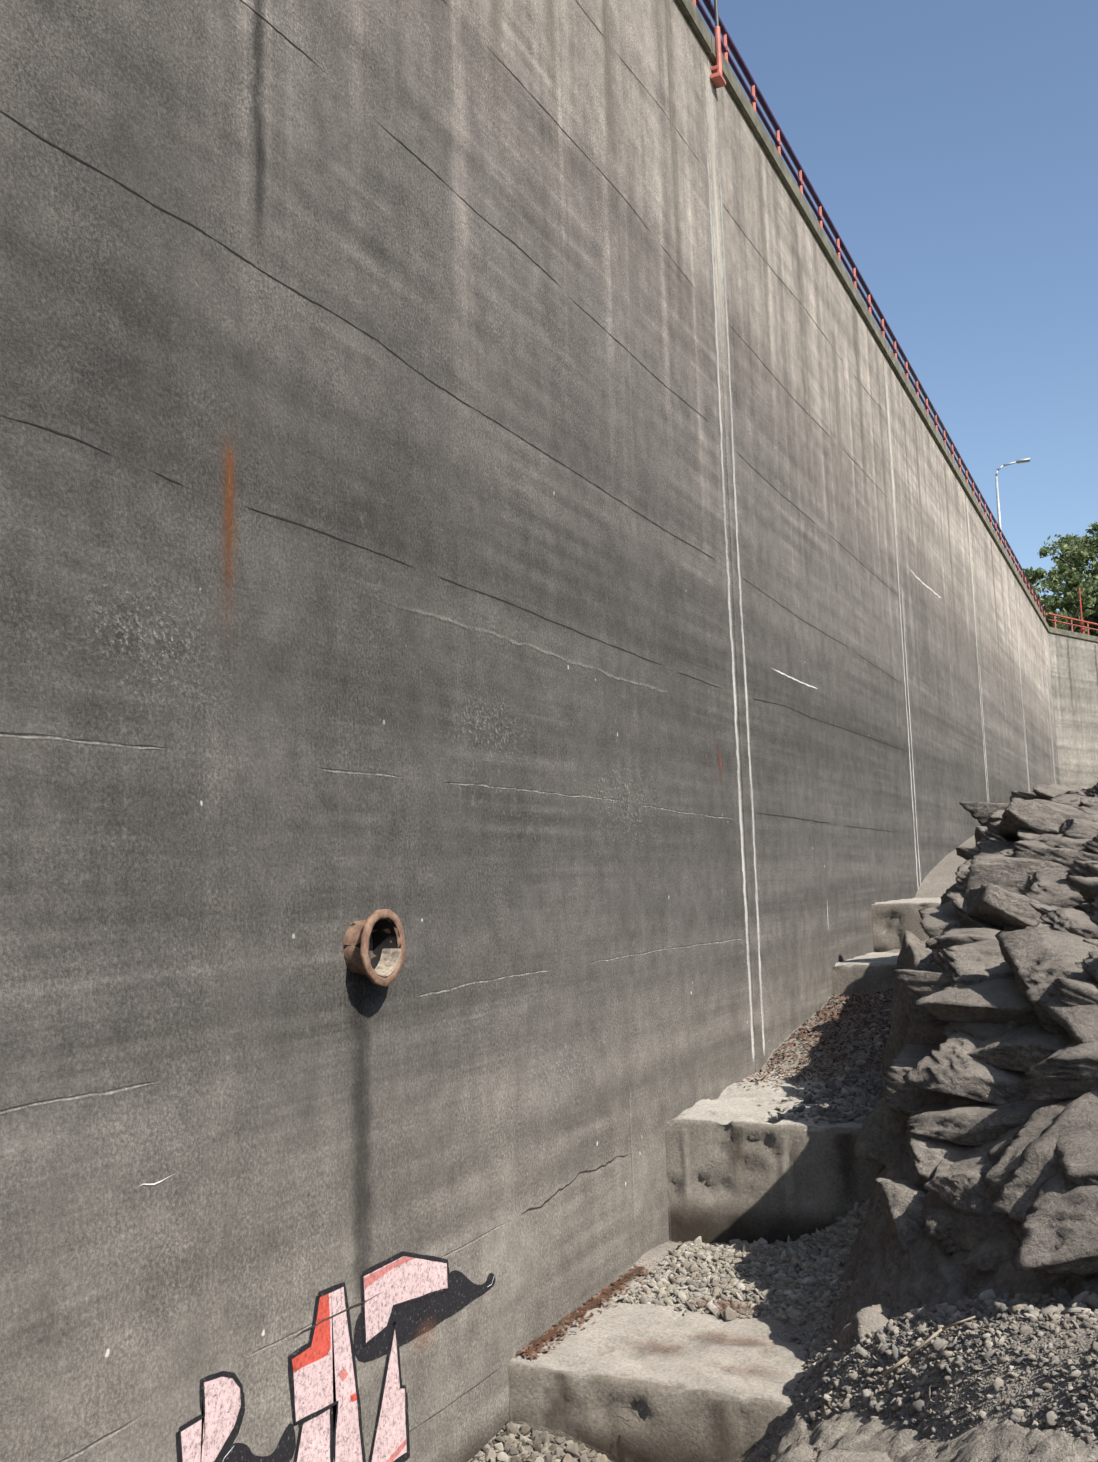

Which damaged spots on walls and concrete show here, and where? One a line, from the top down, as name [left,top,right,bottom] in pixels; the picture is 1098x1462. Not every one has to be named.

crack [440,1154,629,1258]
crack [59,1414,142,1462]